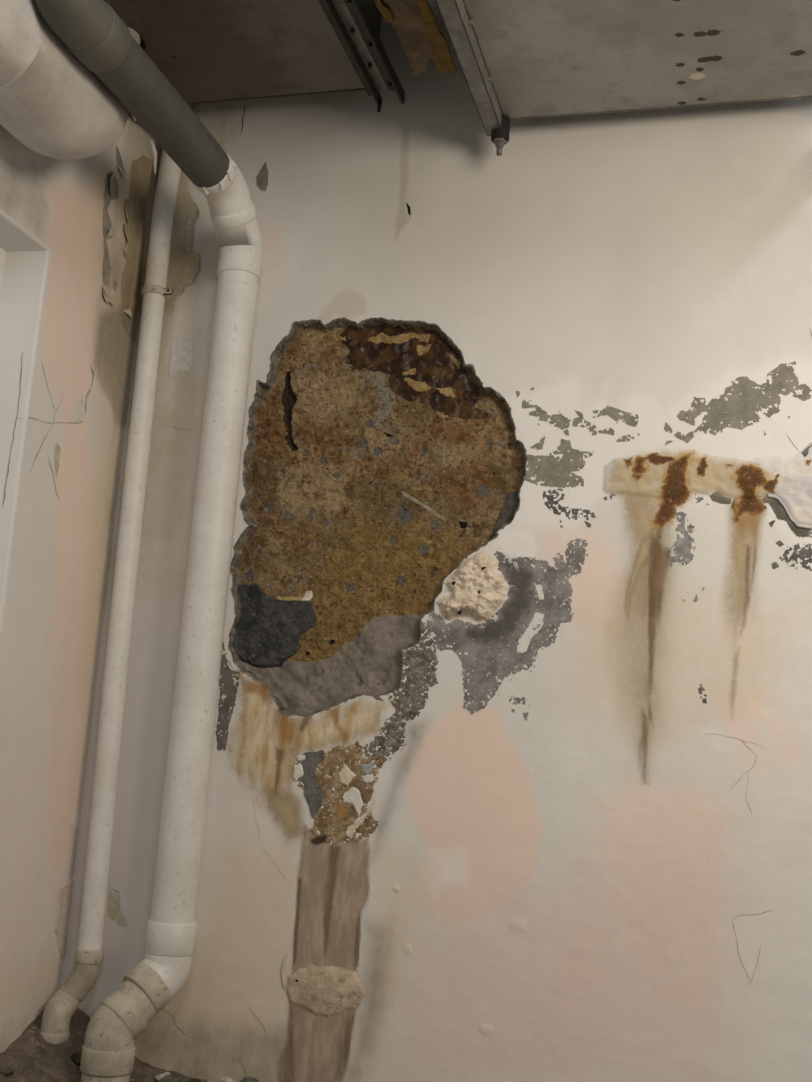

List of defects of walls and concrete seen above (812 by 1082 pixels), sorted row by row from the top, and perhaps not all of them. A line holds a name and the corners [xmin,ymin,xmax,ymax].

peeling [102,145,158,343]
crack [2,351,84,508]
peeling [664,361,812,445]
spalling [215,317,639,751]
corrosion [624,452,708,528]
peeling [666,512,696,569]
water stain [610,456,770,687]
corrosion [726,463,779,523]
peeling [760,494,812,571]
water stain [229,672,385,973]
peeling [293,741,390,845]
water stain [279,1003,355,1082]